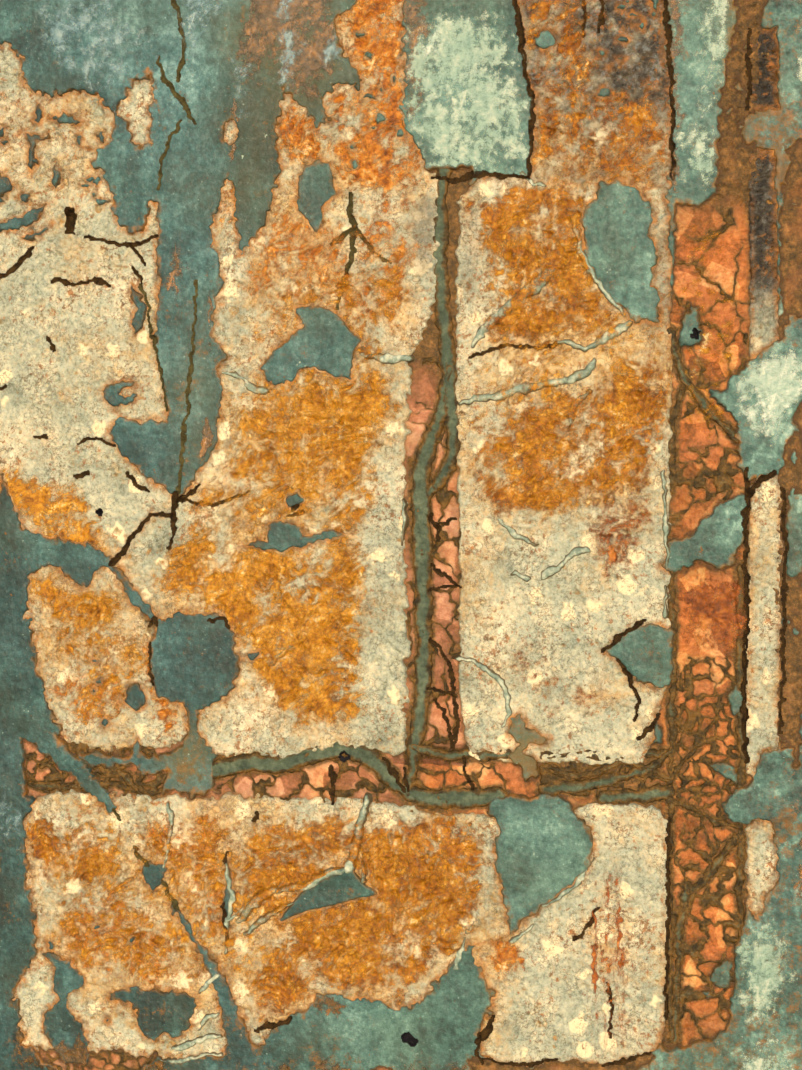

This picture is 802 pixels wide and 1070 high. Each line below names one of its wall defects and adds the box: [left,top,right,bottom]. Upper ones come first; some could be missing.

crack [156,0,197,190]
crack [50,234,250,566]
peeling [0,0,442,779]
rust [153,0,430,726]
peeling [417,0,802,816]
crack [427,512,462,592]
crack [426,637,475,790]
rust [679,578,747,648]
peeling [12,739,780,1070]
crack [663,817,672,1020]
crack [474,1015,558,1068]
crack [601,982,652,1067]